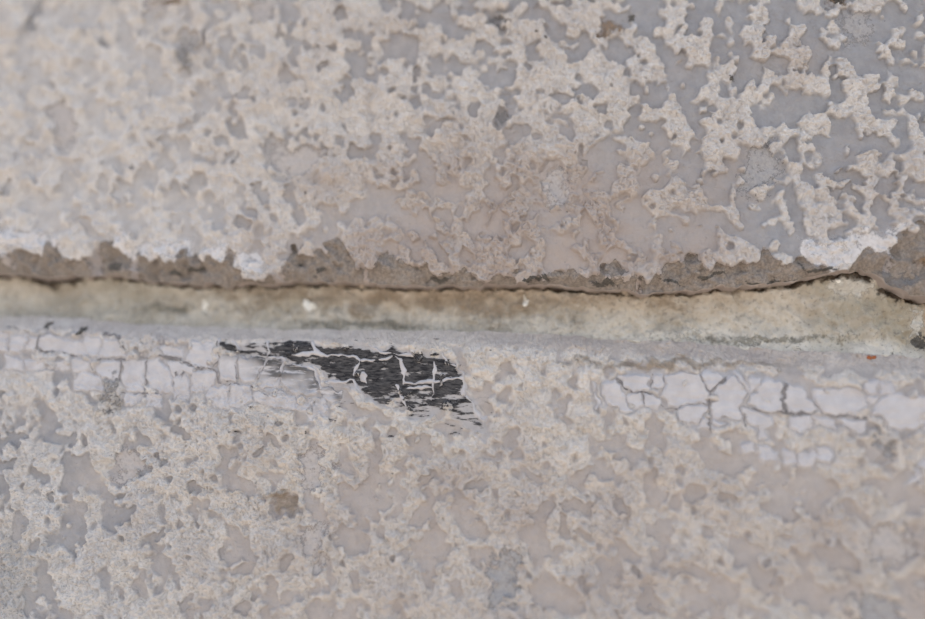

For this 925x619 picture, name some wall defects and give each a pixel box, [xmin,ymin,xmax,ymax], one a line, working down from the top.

spalling [0,218,925,296]
crack [0,272,925,305]
crack [7,326,266,395]
peeling [0,328,495,434]
crack [616,374,726,430]
crack [744,383,868,427]